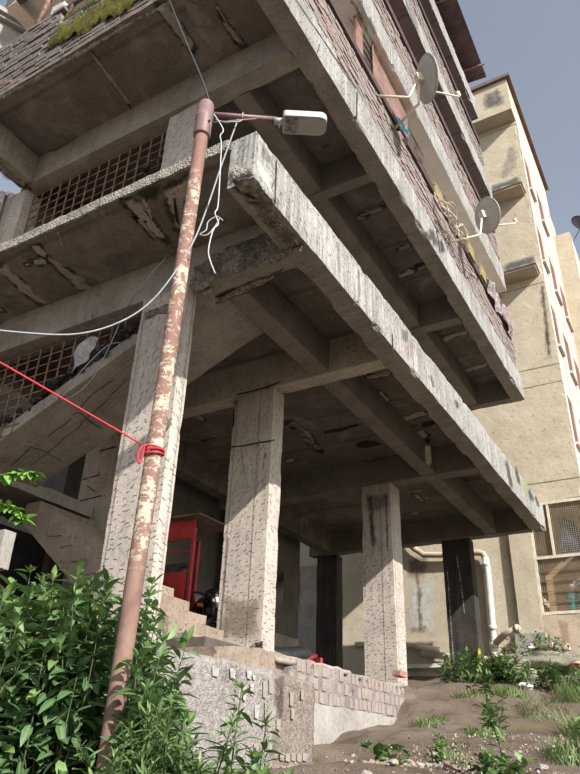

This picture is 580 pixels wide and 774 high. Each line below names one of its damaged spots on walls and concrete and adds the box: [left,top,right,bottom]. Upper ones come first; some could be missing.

peeling [119,175,189,244]
spalling [233,177,301,247]
peeling [0,264,47,305]
peeling [22,243,94,292]
spalling [195,270,282,305]
crack [27,378,129,467]